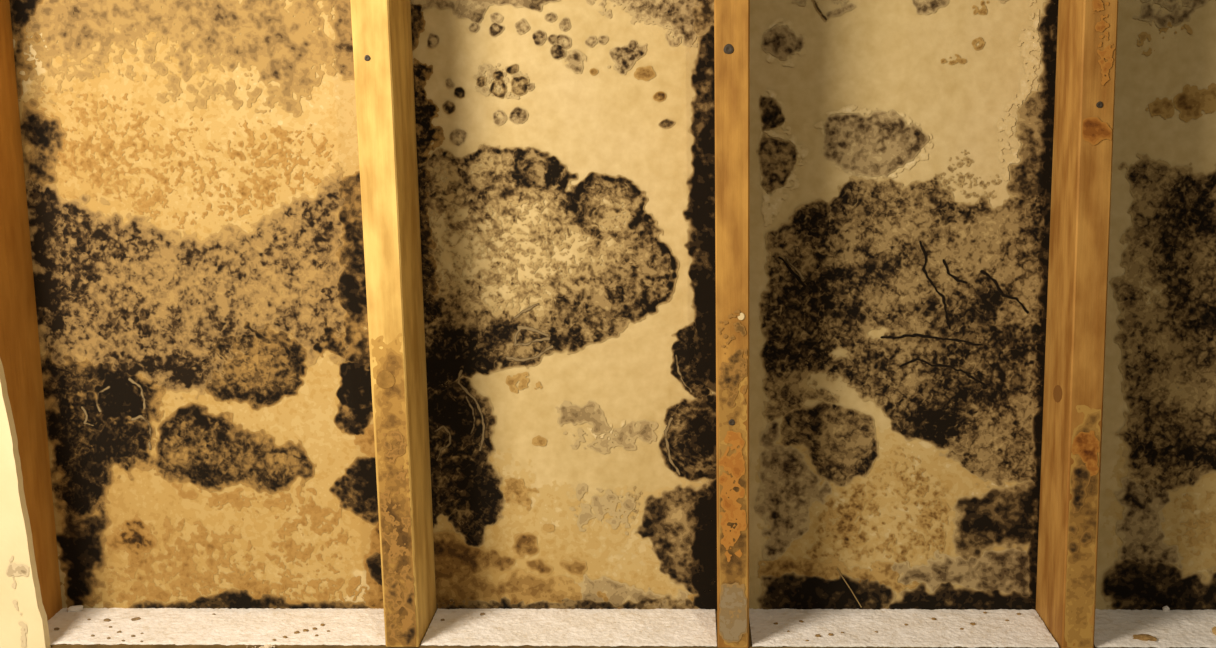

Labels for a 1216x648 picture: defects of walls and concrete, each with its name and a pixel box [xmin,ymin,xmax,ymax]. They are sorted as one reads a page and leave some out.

damp [9,0,415,645]
damp [410,0,1059,611]
damp [1070,162,1216,610]
mould [1146,83,1216,123]